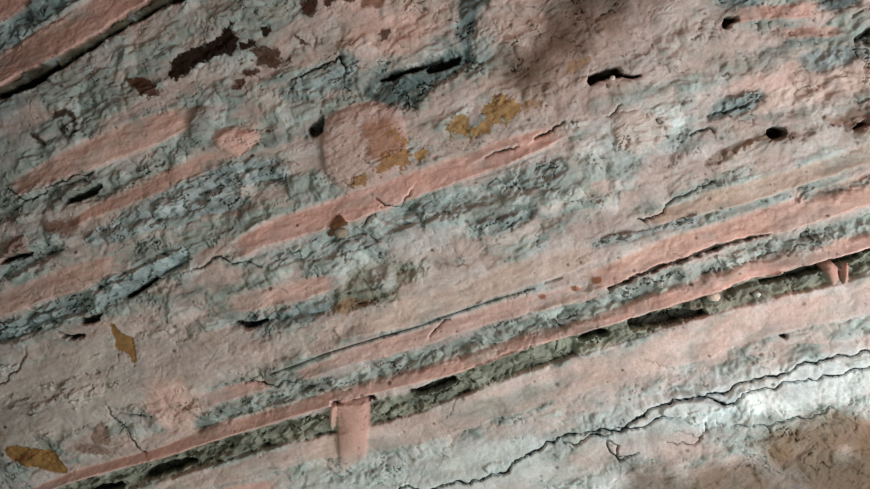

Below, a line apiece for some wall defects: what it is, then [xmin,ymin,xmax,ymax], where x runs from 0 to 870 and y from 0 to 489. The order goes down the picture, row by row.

spalling [0,0,185,104]
leakage [488,0,674,101]
spalling [0,145,188,224]
spalling [83,155,292,248]
rust [360,113,407,162]
spalling [269,155,568,268]
spalling [705,88,766,122]
spalling [704,96,870,171]
crack [246,278,559,387]
spalling [56,208,870,489]
crack [399,349,869,489]
leakage [611,405,870,489]